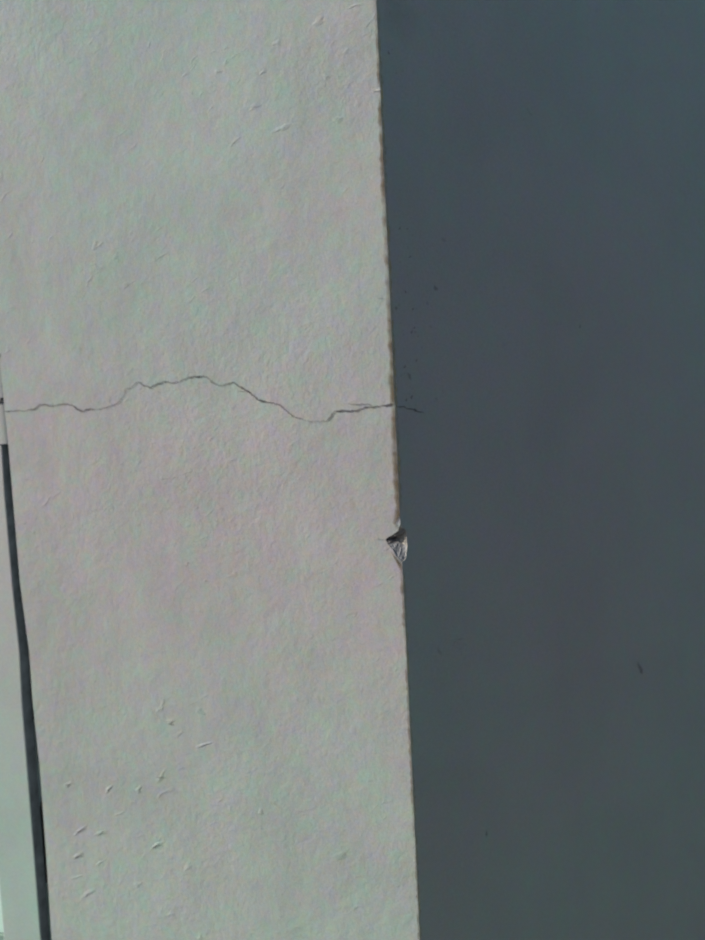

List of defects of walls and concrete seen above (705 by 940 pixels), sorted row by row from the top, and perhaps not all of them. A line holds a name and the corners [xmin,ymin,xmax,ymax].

spalling [386,528,407,566]